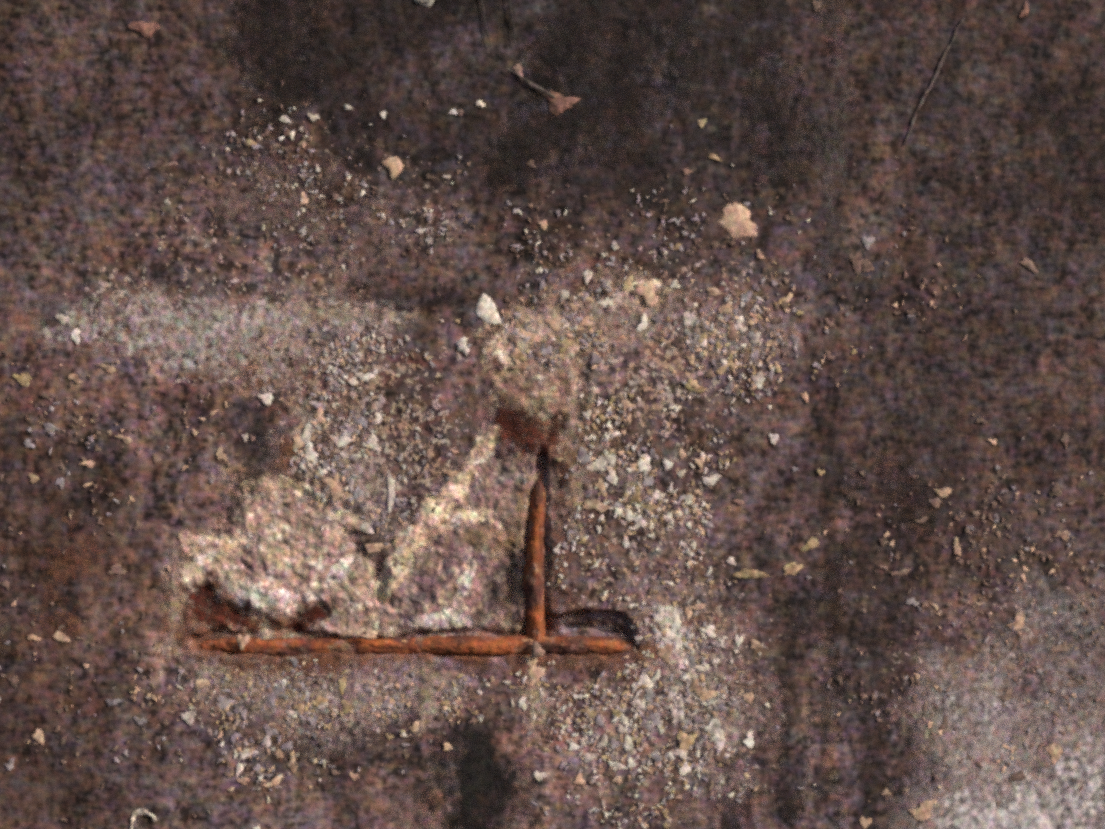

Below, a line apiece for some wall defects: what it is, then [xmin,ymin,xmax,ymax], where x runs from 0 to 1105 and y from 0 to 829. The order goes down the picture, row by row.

peeling [186,104,476,271]
peeling [24,360,169,490]
rust [496,407,565,455]
spalling [155,168,812,829]
spalling [130,808,157,829]
leakage [314,658,460,732]
rust [189,467,657,666]
leakage [448,716,544,829]
leakage [653,603,732,702]
leakage [716,706,760,788]
peeling [906,465,1105,787]
leakage [918,661,1105,829]